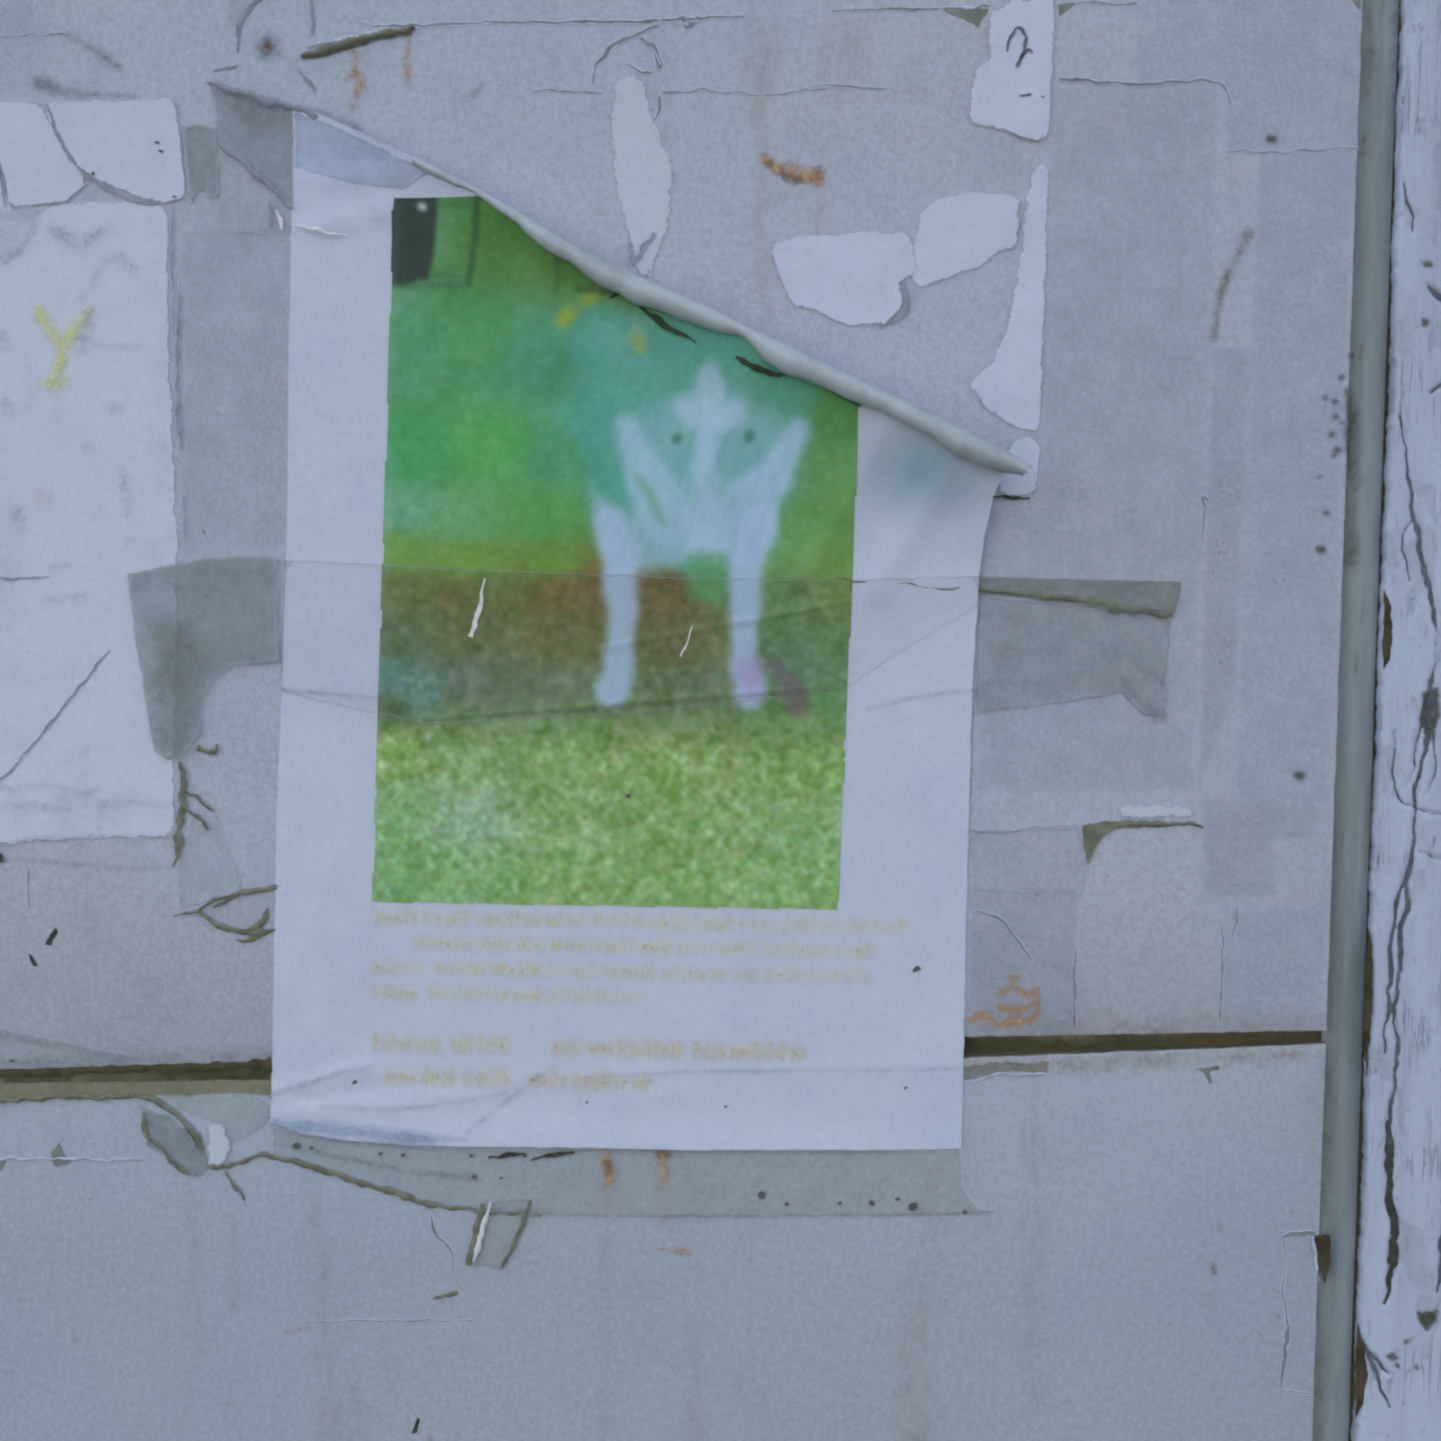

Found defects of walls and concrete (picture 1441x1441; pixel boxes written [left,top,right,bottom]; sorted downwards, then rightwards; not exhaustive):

corrosion [763,156,823,184]
peeling [1382,590,1393,669]
peeling [1363,926,1373,1077]
peeling [0,1143,142,1171]
crack [429,1214,455,1276]
crack [317,1317,472,1325]
peeling [1355,1324,1368,1417]